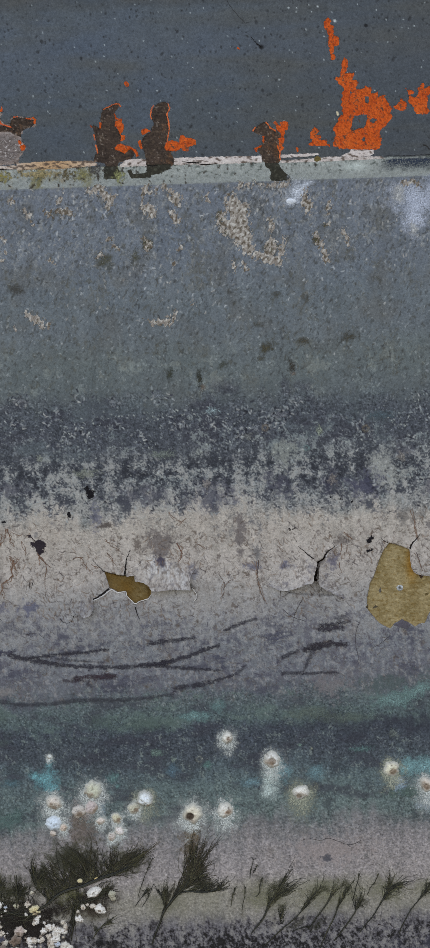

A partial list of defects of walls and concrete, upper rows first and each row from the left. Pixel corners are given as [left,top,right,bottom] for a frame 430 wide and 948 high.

spalling [0,106,97,171]
peeling [120,159,158,167]
corrosion [90,102,196,179]
peeling [174,156,262,166]
corrosion [252,121,292,181]
flaking render [126,561,196,592]
flaking render [267,545,344,599]